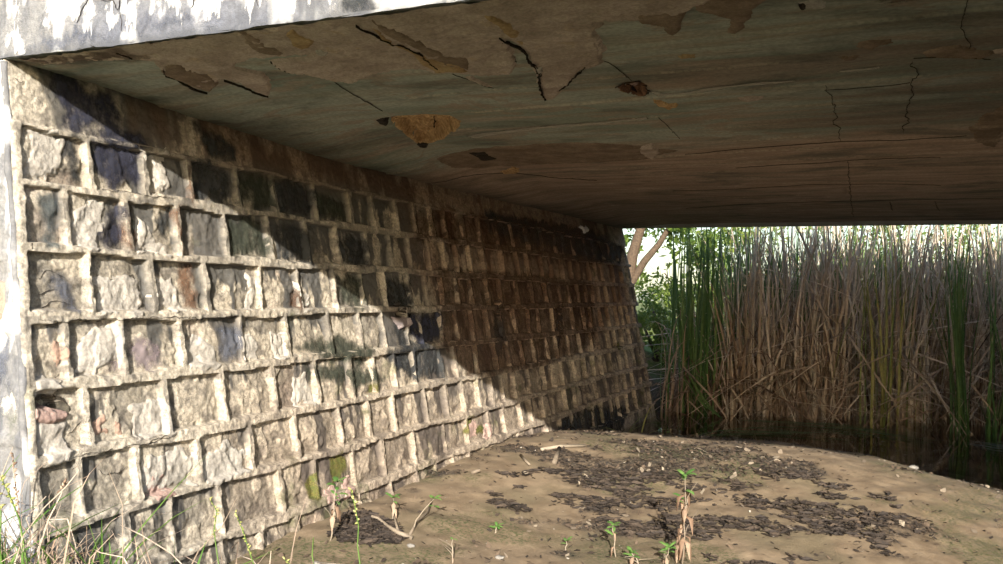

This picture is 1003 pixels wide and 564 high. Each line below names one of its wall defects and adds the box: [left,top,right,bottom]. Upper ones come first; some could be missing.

water stain [21,25,149,190]
peeling [6,0,766,100]
crack [356,25,438,70]
spalling [376,114,461,148]
crack [499,38,630,101]
crack [659,57,962,217]
water stain [98,204,129,250]
water stain [191,122,352,266]
flaking render [51,275,186,376]
water stain [291,335,382,391]
water stain [386,278,445,380]
spalling [34,373,74,466]